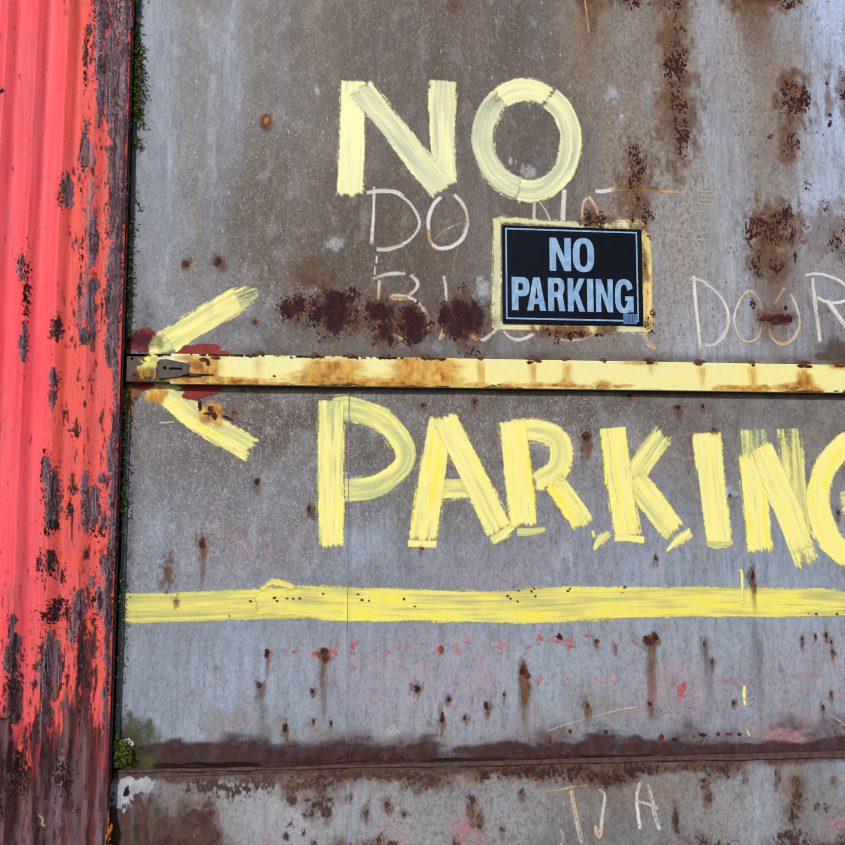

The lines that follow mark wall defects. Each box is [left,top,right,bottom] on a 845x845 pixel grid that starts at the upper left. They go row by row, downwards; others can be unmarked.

rust [621,0,697,159]
rust [767,68,811,161]
rust [579,208,612,228]
rust [617,137,656,240]
rust [737,198,820,277]
rust [750,298,793,328]
rust [169,356,226,383]
rust [749,364,815,391]
rust [519,660,530,705]
rust [643,632,660,676]
rust [455,730,845,802]
rust [773,776,819,845]